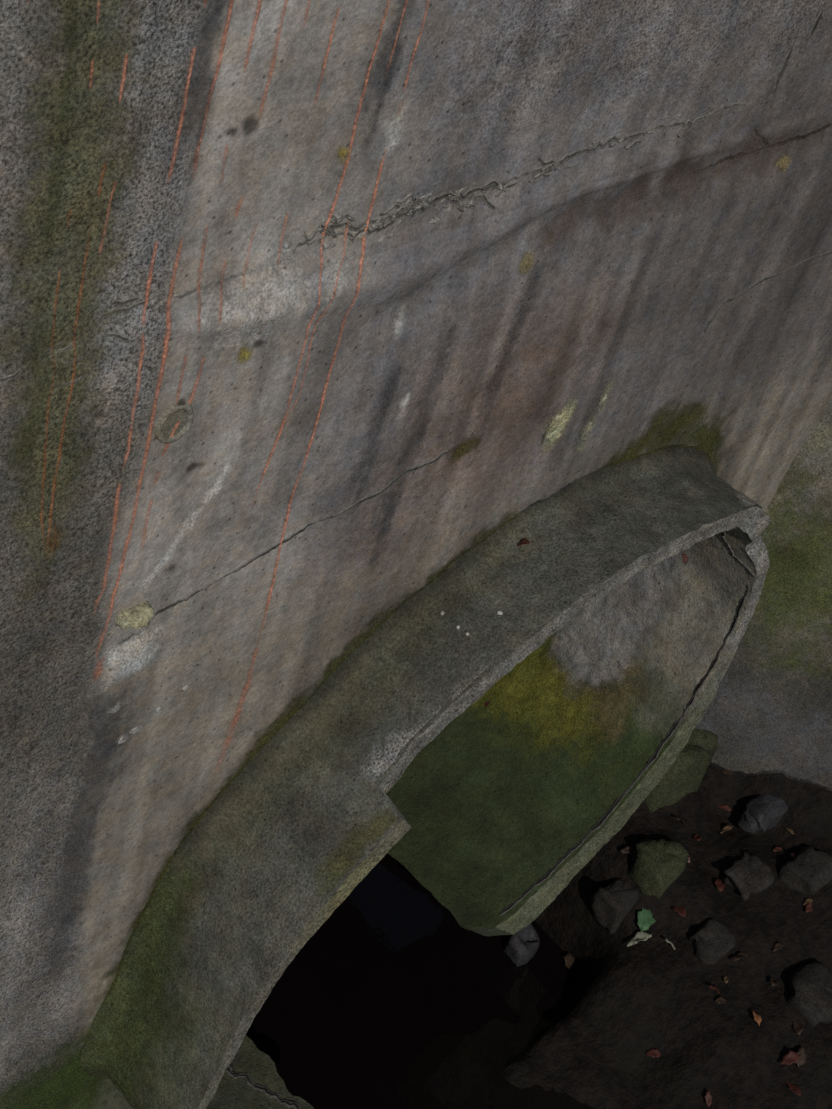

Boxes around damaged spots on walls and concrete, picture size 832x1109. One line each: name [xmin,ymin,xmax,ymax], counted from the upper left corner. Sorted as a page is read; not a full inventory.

rust [97,242,182,644]
rust [169,49,196,176]
crack [100,449,450,655]
rust [263,0,390,620]
damp [371,372,410,436]
crack [0,11,832,396]